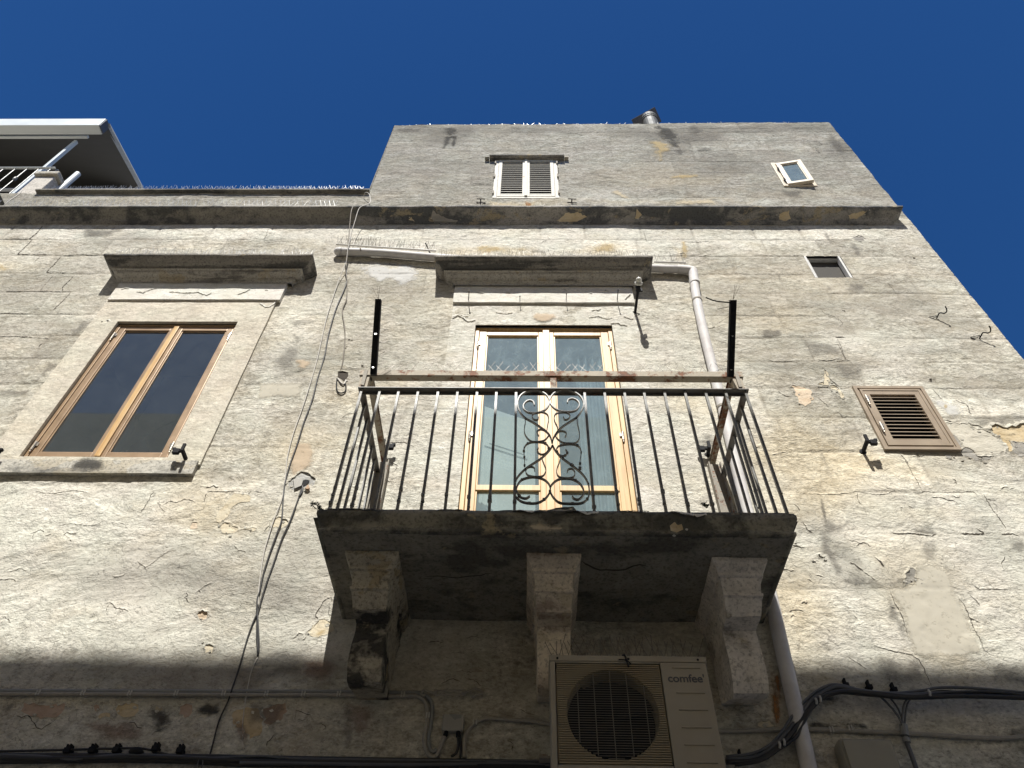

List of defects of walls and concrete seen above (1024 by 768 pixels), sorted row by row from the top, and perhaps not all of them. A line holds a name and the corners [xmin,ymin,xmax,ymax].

flaking render [556,209,588,224]
flaking render [790,369,846,407]
flaking render [943,420,1024,464]
crack [30,484,265,541]
flaking render [214,491,293,537]
crack [105,549,176,612]
crack [185,582,212,603]
crack [784,453,1020,687]
flaking render [193,608,211,622]
flaking render [304,616,338,639]
damp [199,704,219,715]